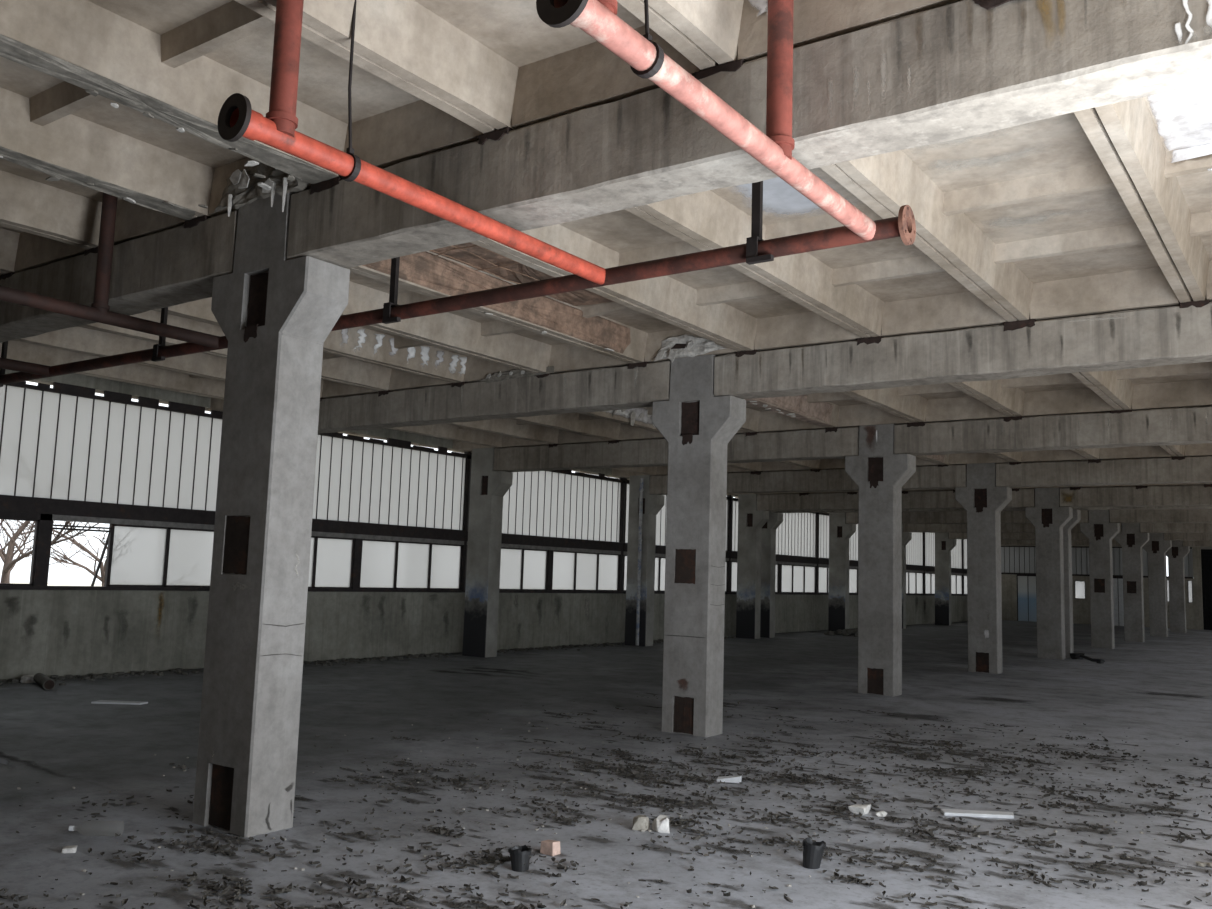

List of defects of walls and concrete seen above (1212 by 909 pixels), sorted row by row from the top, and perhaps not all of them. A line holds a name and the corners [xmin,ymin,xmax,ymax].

peeling [749,0,768,16]
efflorescence [1175,0,1212,43]
efflorescence [341,329,467,374]